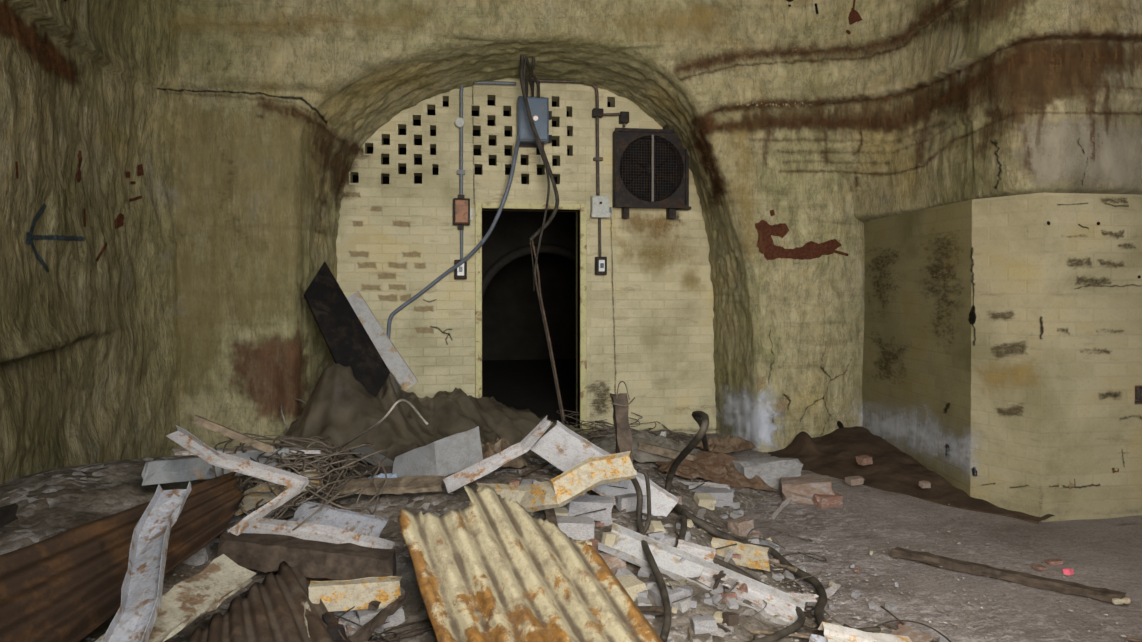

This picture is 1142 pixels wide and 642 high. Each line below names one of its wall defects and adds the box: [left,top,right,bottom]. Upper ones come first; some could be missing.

corrosion [0,4,77,84]
corrosion [676,0,1027,80]
crack [157,88,327,126]
corrosion [691,32,1142,204]
damp [174,104,320,393]
damp [715,393,776,444]
crack [800,353,847,435]